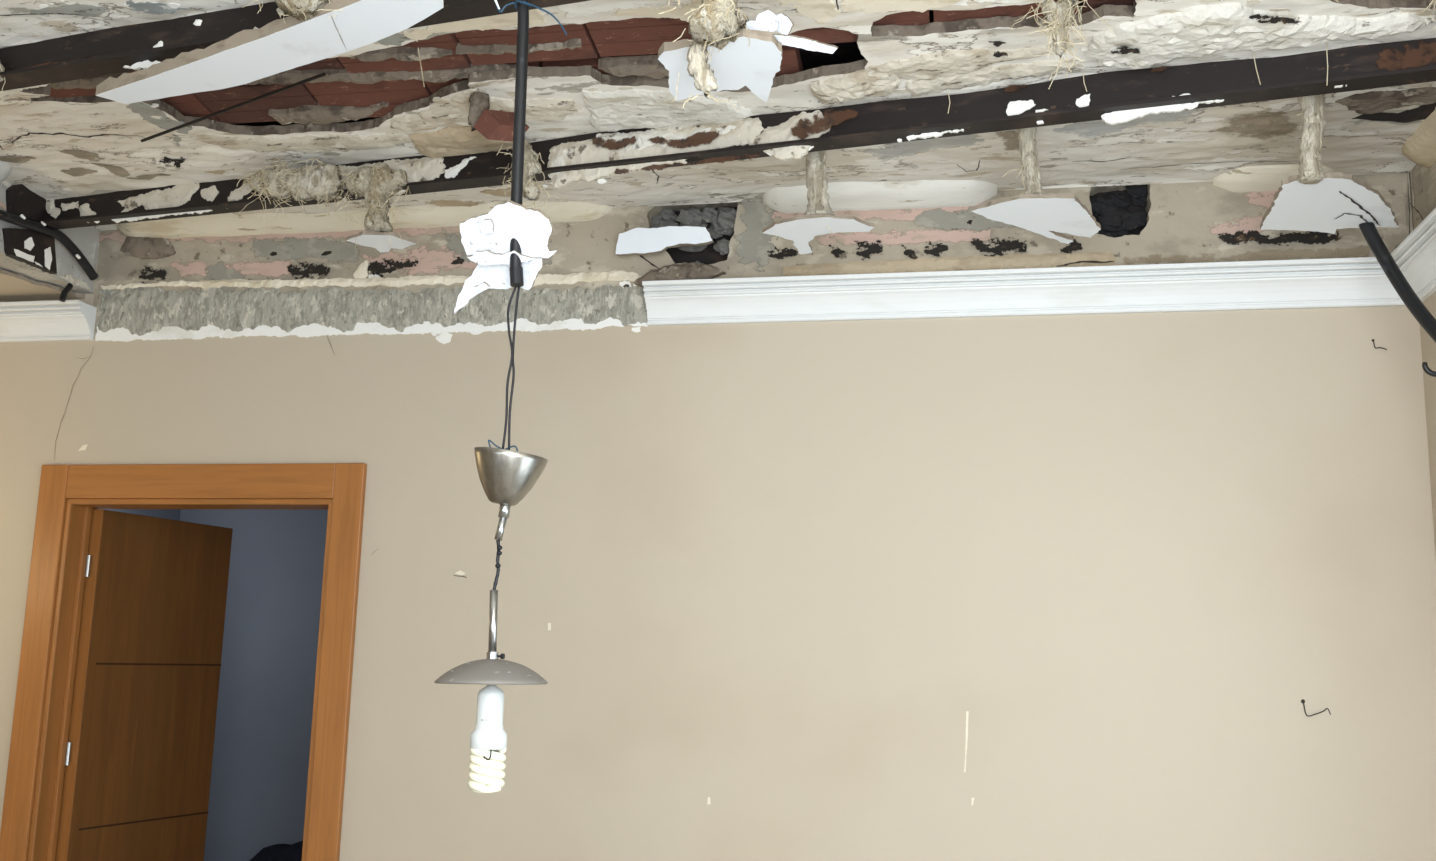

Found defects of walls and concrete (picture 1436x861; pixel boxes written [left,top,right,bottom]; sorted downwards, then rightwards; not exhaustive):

peeling [29,0,189,17]
flaking render [841,0,1135,26]
flaking render [0,71,136,98]
flaking render [126,0,702,146]
flaking render [774,27,857,77]
flaking render [1352,102,1436,123]
peeling [425,188,524,207]
spalling [651,206,737,265]
spalling [1089,184,1148,238]
crack [54,346,94,460]